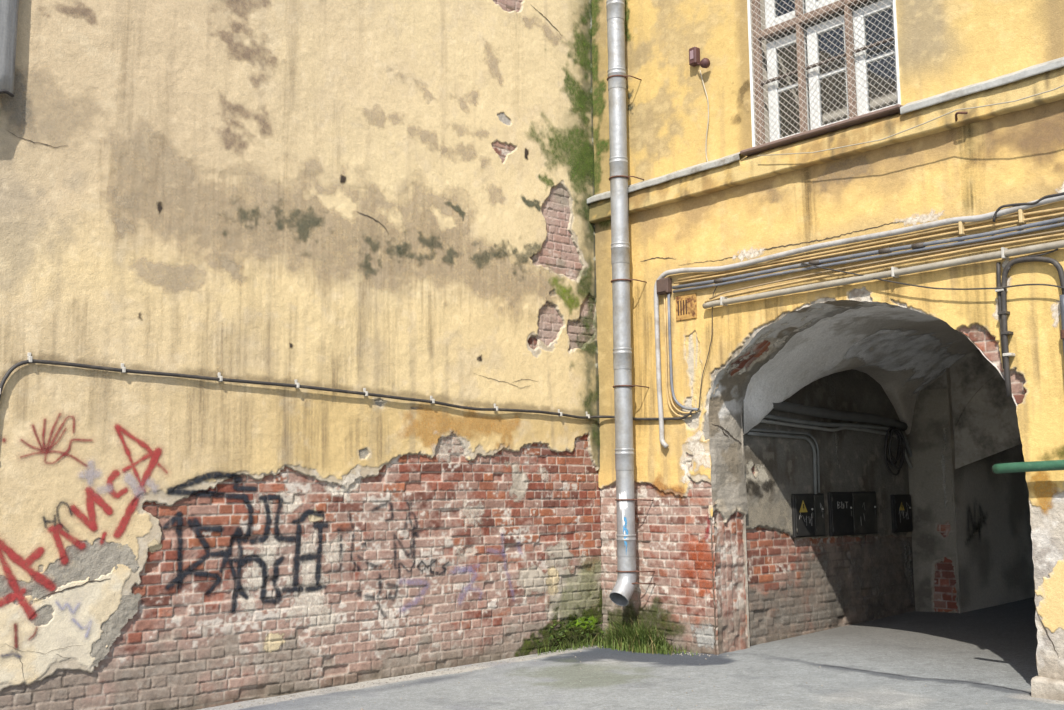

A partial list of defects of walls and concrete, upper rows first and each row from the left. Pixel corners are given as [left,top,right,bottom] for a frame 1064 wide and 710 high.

leakage [222,0,275,63]
flaking render [493,0,561,44]
leakage [224,103,269,133]
peeling [365,109,528,166]
peeling [109,130,596,350]
flaking render [733,247,765,262]
flaking render [900,210,942,225]
flaking render [1051,300,1061,326]
peeling [844,330,965,392]
flaking render [959,325,1027,404]
flaking render [0,432,916,710]
flaking render [1029,491,1064,680]